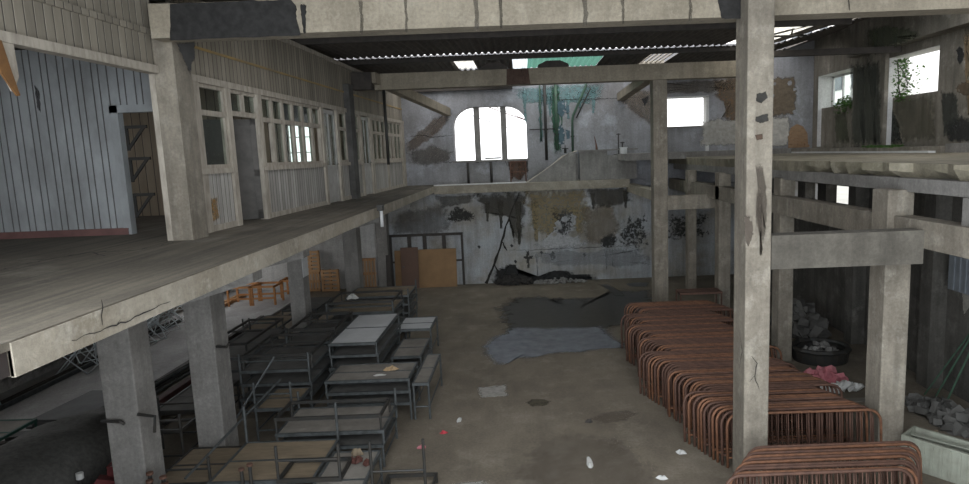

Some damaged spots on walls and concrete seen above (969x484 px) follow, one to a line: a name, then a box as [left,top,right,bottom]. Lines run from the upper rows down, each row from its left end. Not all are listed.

damp [522,90,596,141]
spalling [756,76,809,148]
damp [438,188,649,275]
crack [72,300,171,341]